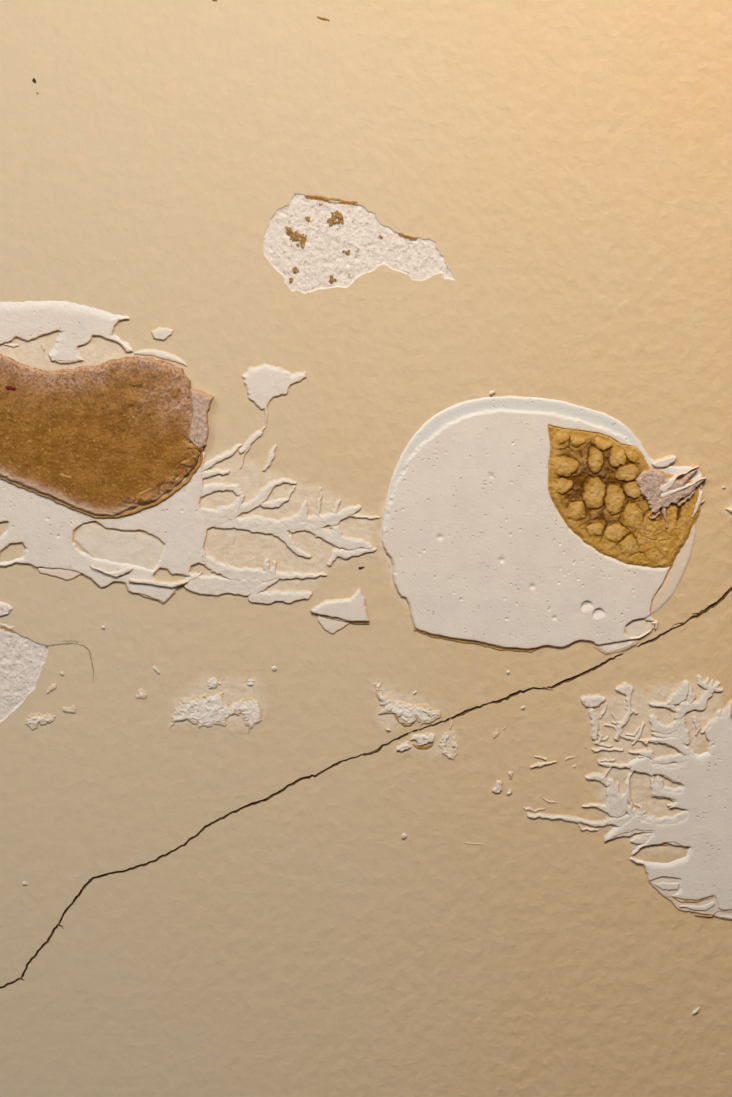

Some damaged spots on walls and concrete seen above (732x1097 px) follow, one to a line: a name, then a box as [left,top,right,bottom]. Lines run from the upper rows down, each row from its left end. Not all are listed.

peeling [263,194,455,294]
peeling [0,301,732,655]
peeling [0,602,49,722]
crack [0,587,732,989]
peeling [526,674,732,921]